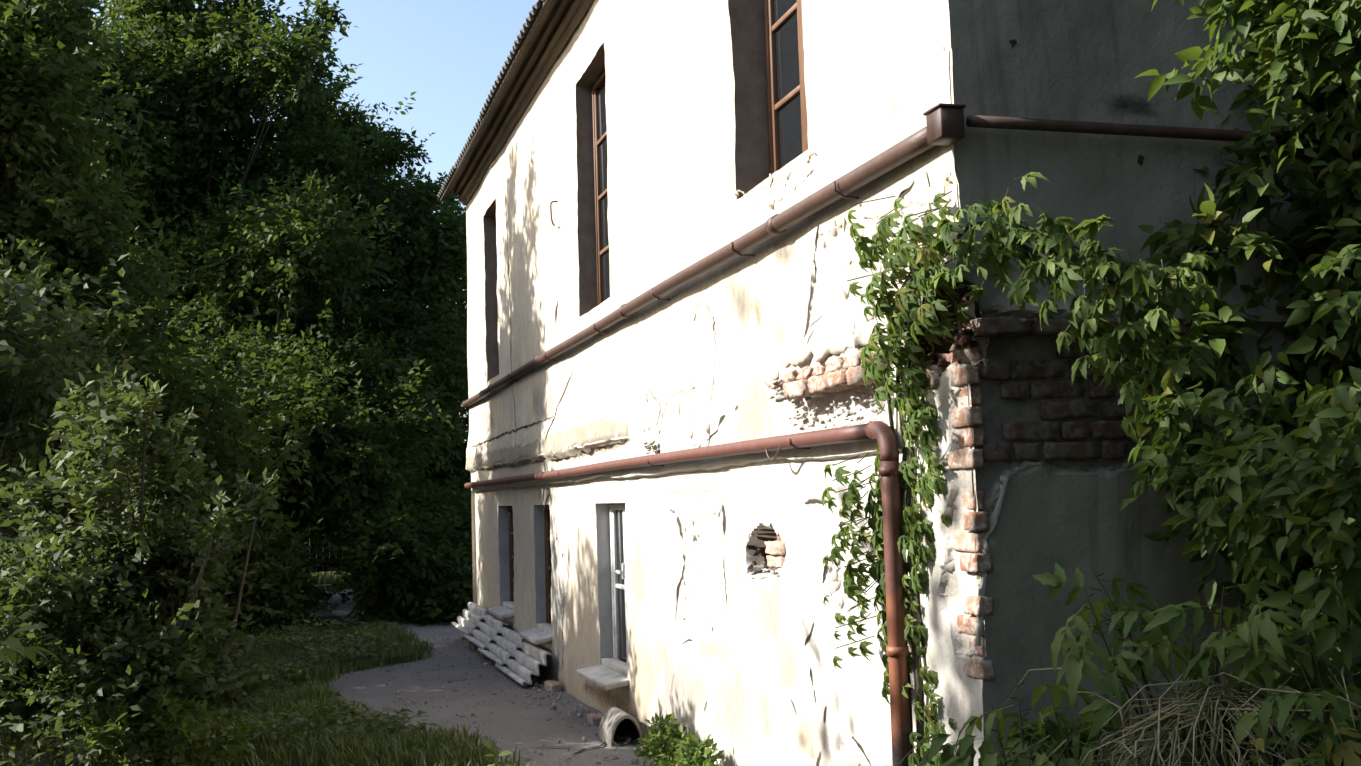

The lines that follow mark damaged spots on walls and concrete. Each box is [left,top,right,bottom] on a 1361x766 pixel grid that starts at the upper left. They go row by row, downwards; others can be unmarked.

flaking render [732,152,820,222]
spalling [764,171,959,431]
peeling [658,302,716,449]
hole [746,523,786,580]
spalling [914,300,1192,680]
crack [790,622,887,766]